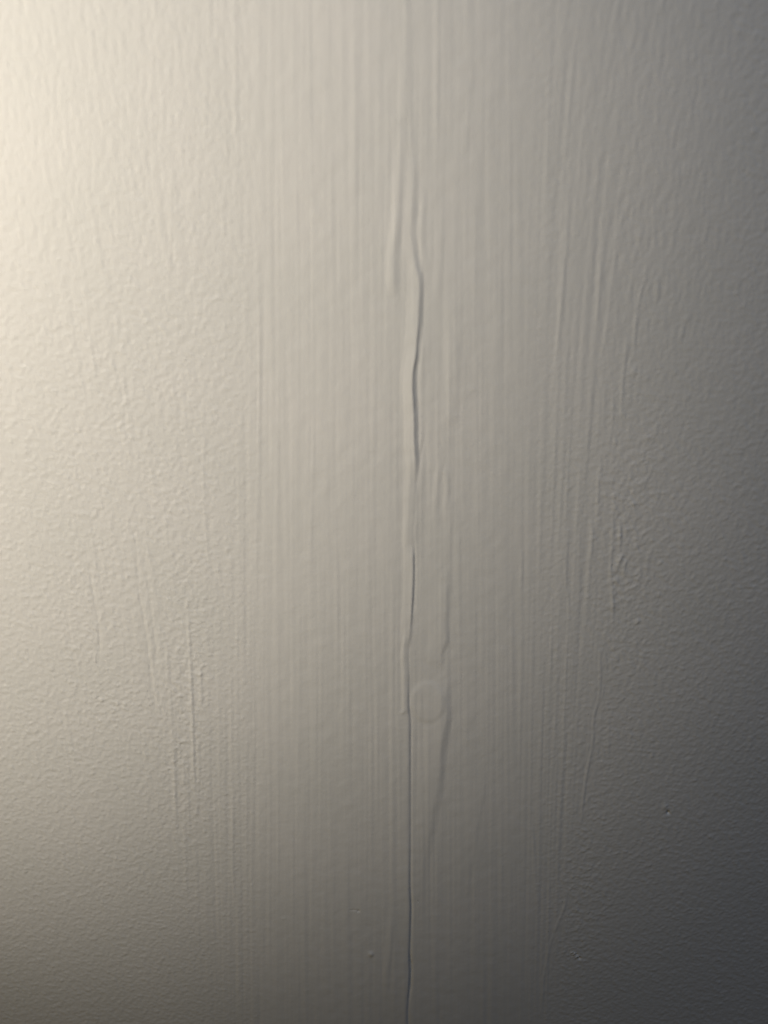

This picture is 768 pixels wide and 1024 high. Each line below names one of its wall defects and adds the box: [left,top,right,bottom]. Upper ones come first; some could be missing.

crack [402,272,430,1024]